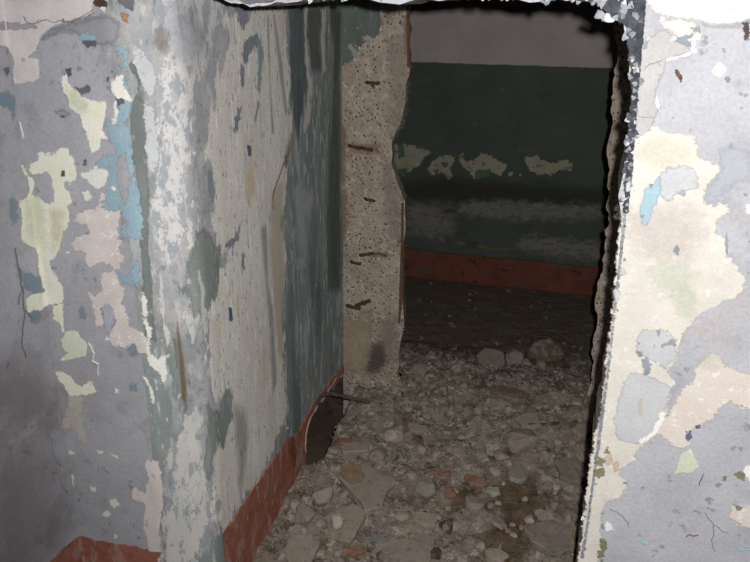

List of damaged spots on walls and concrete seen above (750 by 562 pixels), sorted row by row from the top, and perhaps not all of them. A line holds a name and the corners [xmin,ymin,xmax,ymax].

peeling [341,0,383,65]
crack [272,140,292,210]
peeling [394,144,521,180]
crack [15,248,35,358]
peeling [0,0,293,562]
rust [177,332,185,400]
spalling [343,299,385,372]
peeling [571,0,750,562]